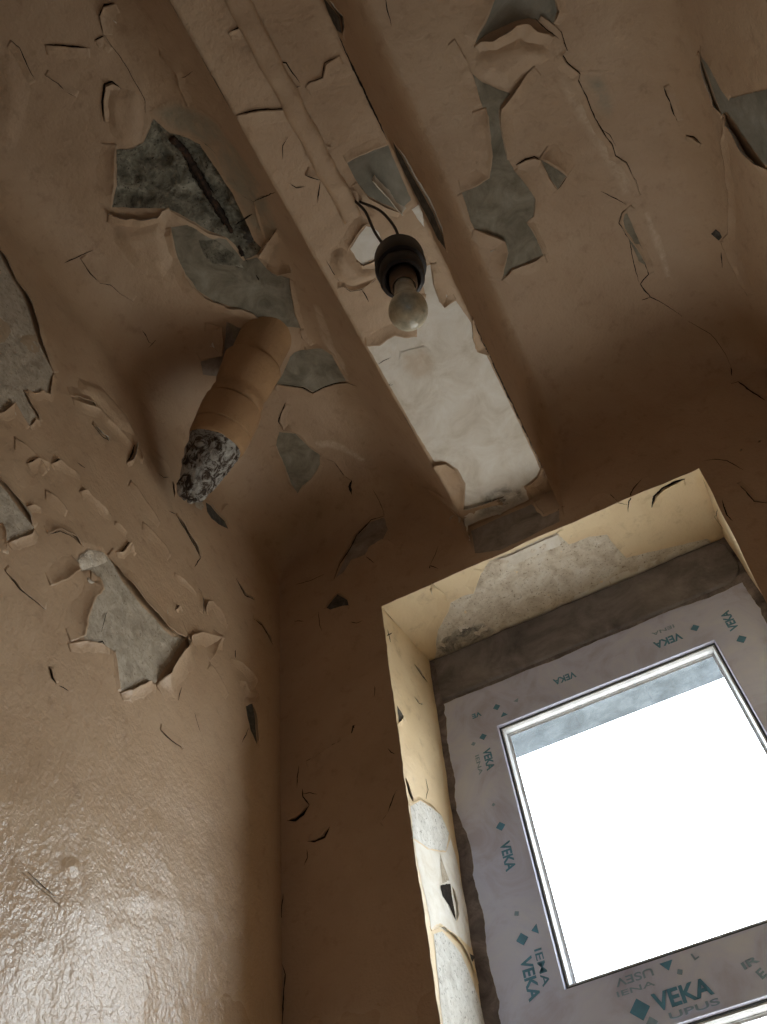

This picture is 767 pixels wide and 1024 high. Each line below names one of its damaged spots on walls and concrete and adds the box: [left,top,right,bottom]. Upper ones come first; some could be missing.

peeling [0,242,59,430]
spalling [94,119,304,328]
peeling [274,344,356,399]
peeling [339,216,381,269]
peeling [343,138,448,253]
peeling [448,0,575,286]
peeling [365,262,711,659]
crack [588,479,686,508]
crack [537,16,767,401]
peeling [696,46,767,179]
peeling [45,547,225,702]
peeling [408,796,485,1024]